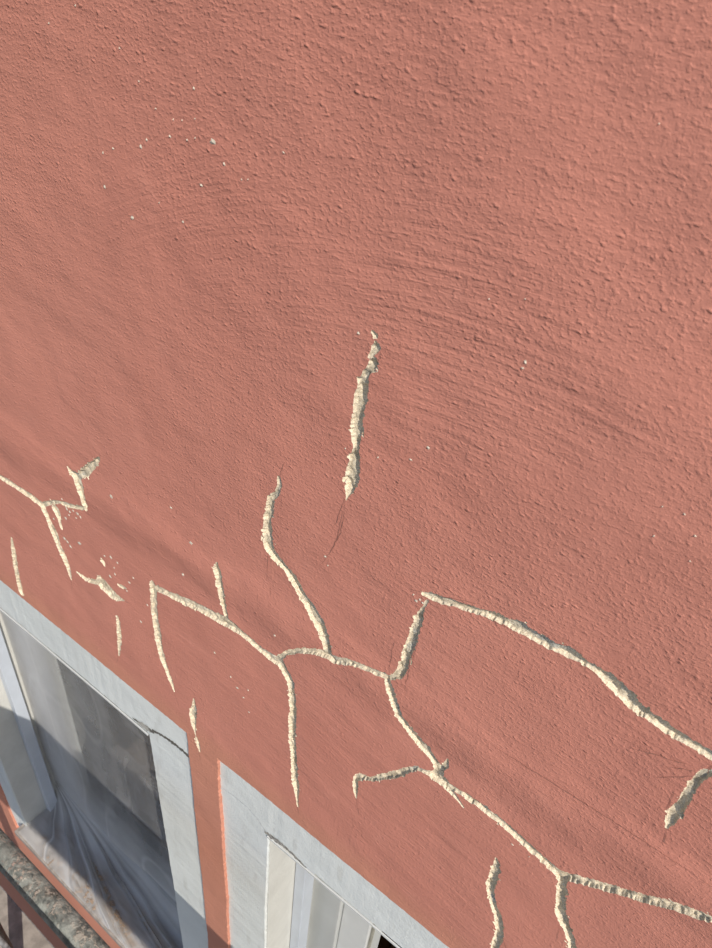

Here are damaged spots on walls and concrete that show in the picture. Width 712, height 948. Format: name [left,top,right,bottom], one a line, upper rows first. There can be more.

crack [11,537,24,596]
crack [0,456,100,584]
crack [325,330,381,560]
crack [104,462,712,948]